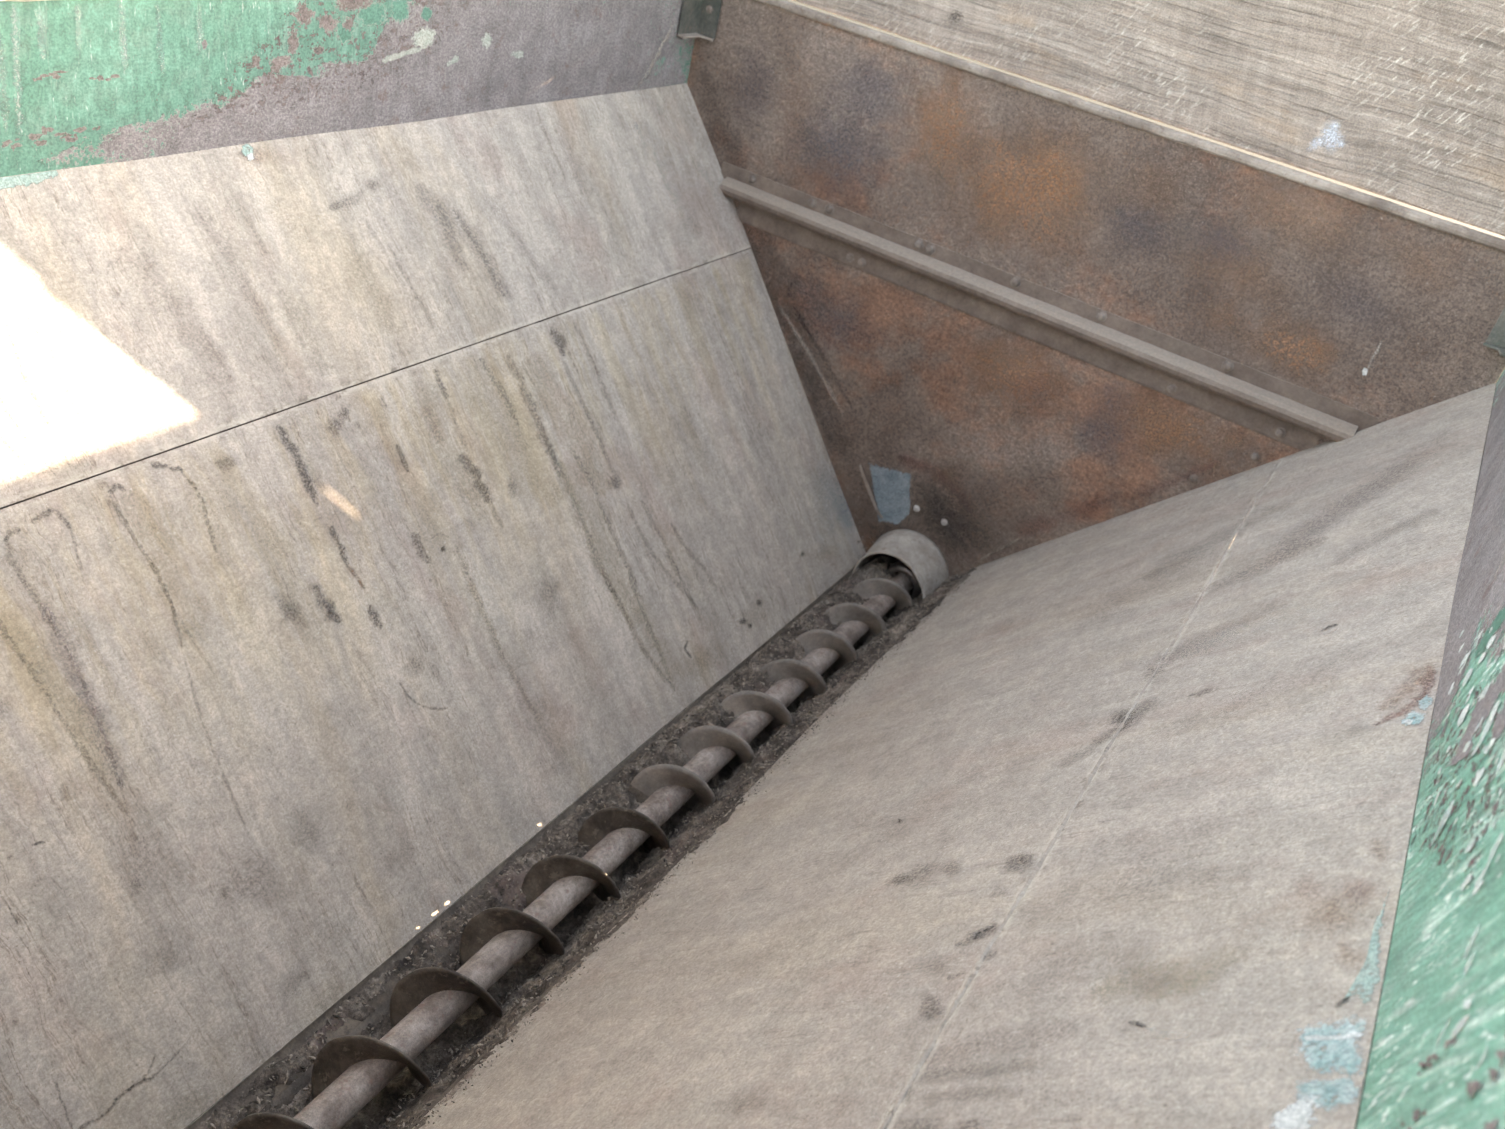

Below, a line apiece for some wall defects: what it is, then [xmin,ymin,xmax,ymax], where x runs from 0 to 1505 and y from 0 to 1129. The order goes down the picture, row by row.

peeling [0,0,695,189]
leakage [278,427,316,503]
leakage [330,526,364,588]
peeling [1269,902,1385,1129]
peeling [1417,998,1472,1075]
peeling [1466,1035,1505,1099]
peeling [1401,1109,1427,1129]